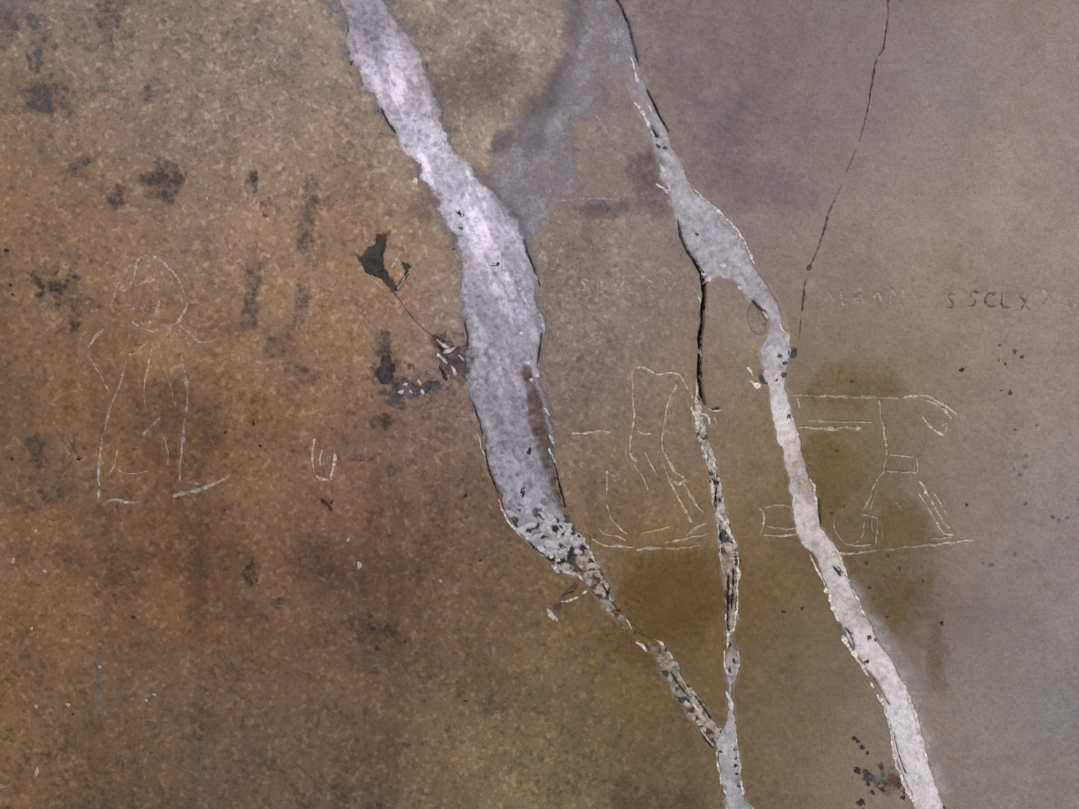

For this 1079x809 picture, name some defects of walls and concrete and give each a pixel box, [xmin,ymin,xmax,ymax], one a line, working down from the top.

damp [474,0,641,246]
spalling [358,235,411,292]
crack [338,0,946,809]